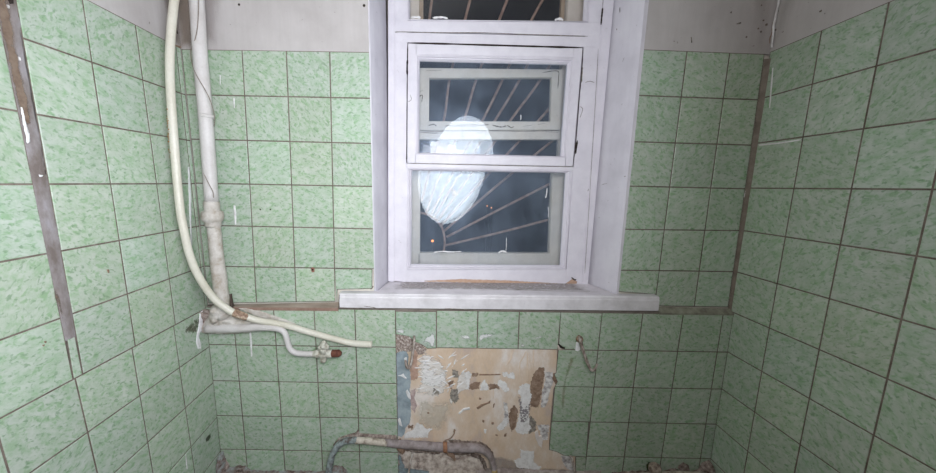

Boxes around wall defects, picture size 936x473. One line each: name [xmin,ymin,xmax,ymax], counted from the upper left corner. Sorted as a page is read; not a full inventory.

flaking render [396,334,581,473]